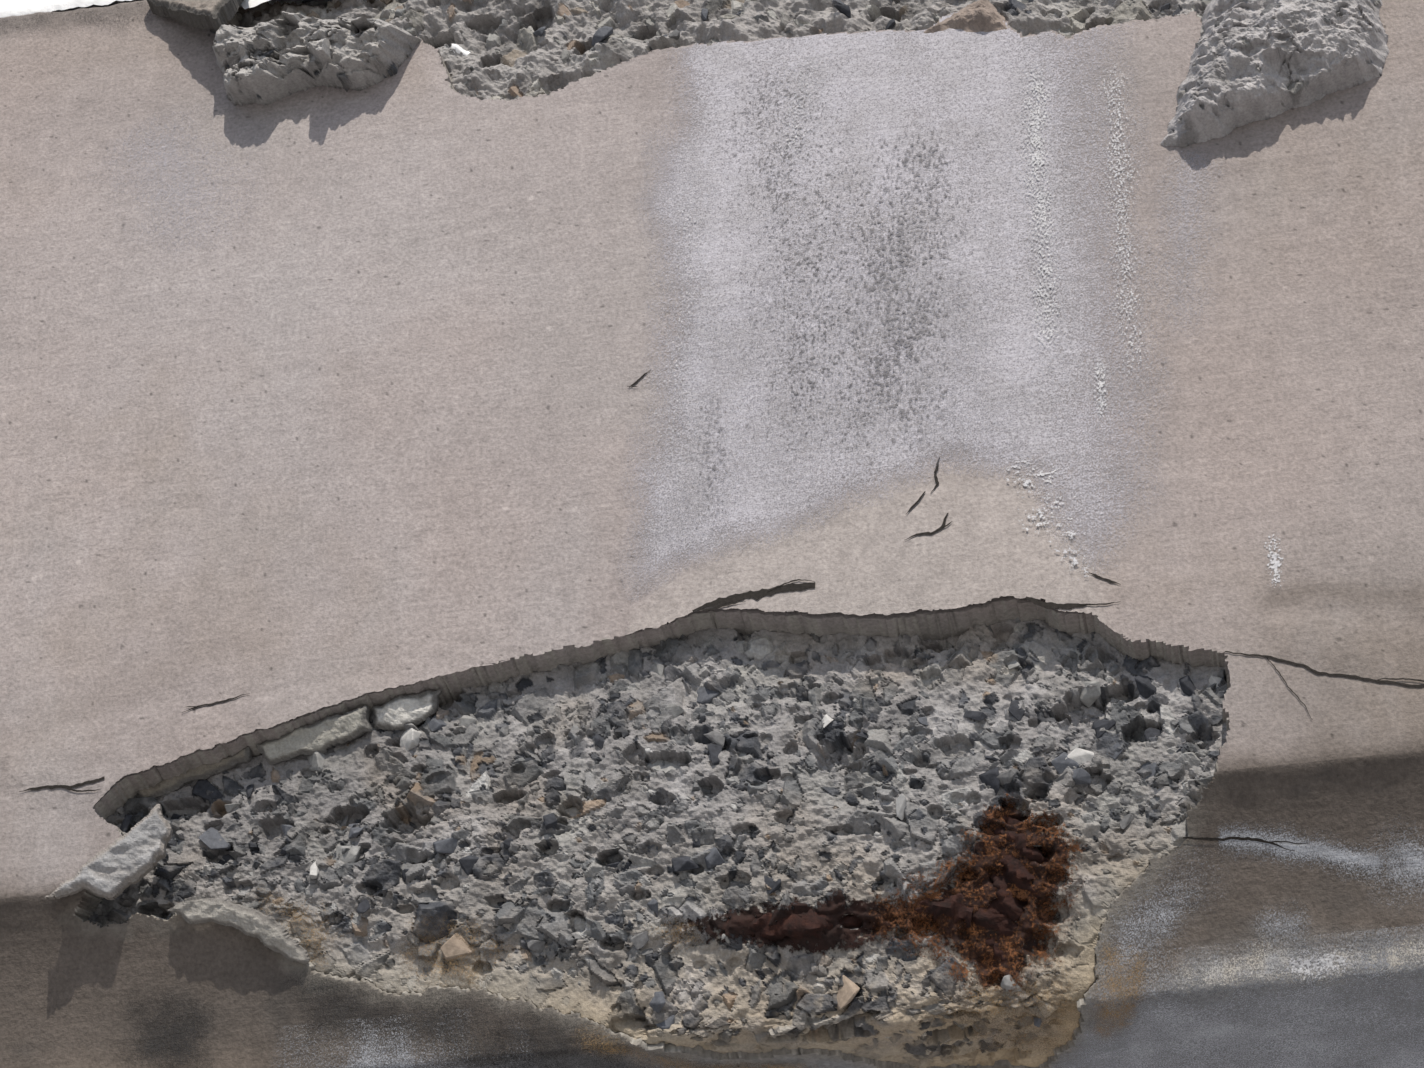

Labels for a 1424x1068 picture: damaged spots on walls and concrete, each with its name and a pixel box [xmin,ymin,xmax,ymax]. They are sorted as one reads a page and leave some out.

spalling [147,0,1389,147]
leakage [625,12,1216,600]
crack [905,457,952,540]
crack [692,579,815,612]
crack [1225,651,1424,719]
crack [19,777,105,792]
spalling [45,617,1227,1068]
leakage [279,976,701,1068]
corrosion [651,793,1085,1053]
leakage [1052,862,1424,1068]